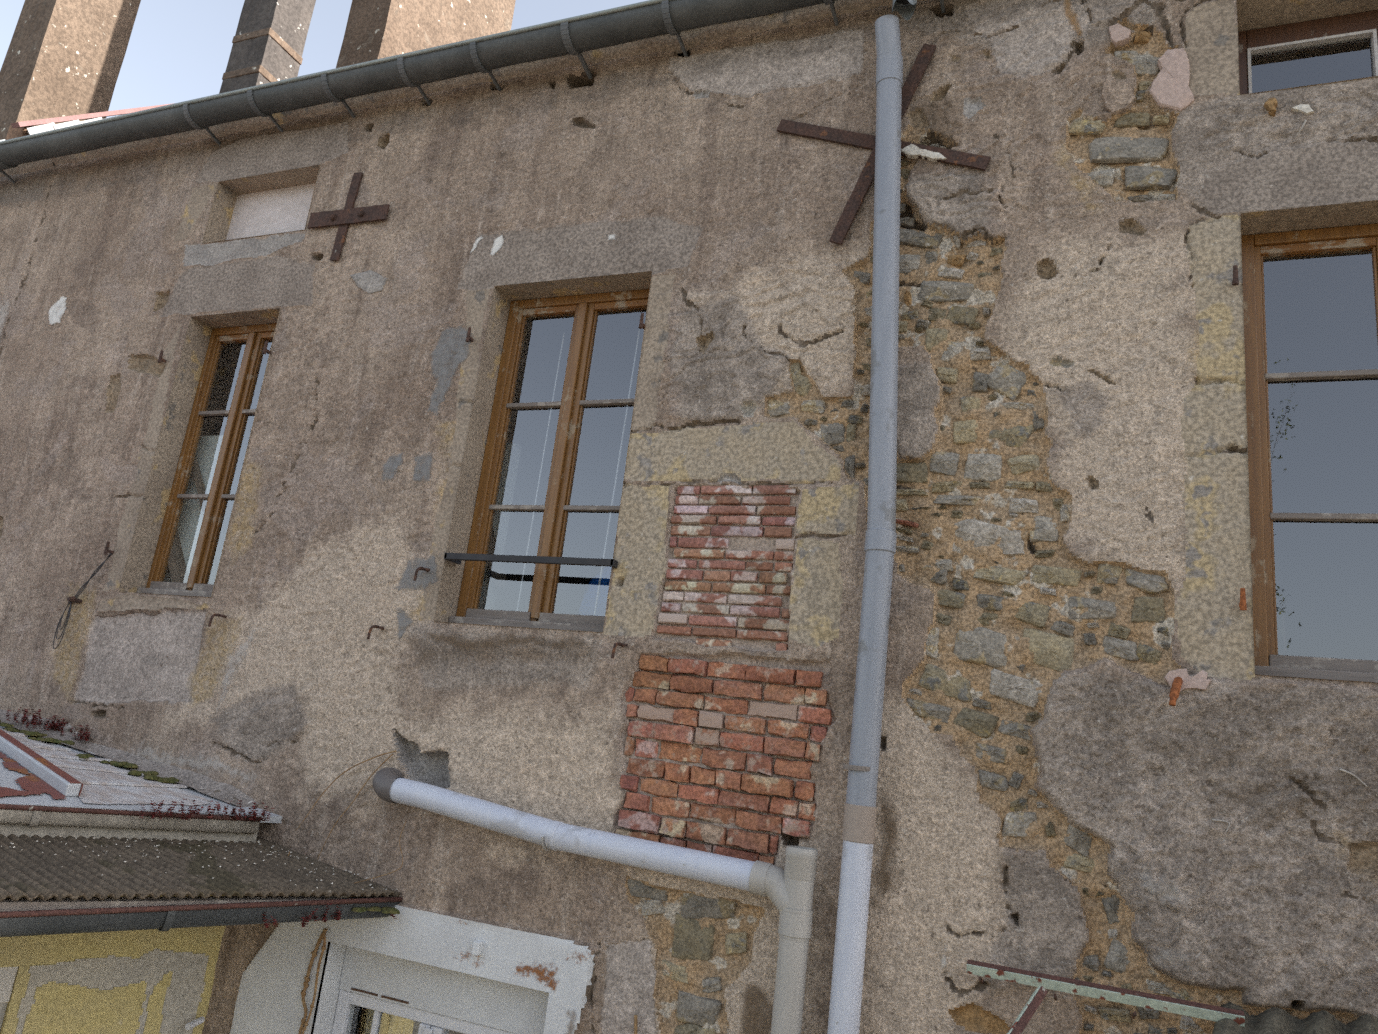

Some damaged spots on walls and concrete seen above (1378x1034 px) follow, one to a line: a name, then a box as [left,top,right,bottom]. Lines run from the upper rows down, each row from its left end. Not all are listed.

spalling [1056,41,1084,74]
flaking render [930,83,952,103]
flaking render [1066,17,1194,236]
crack [681,287,703,354]
crack [742,325,844,362]
flaking render [740,220,874,522]
flaking render [894,125,1358,1034]